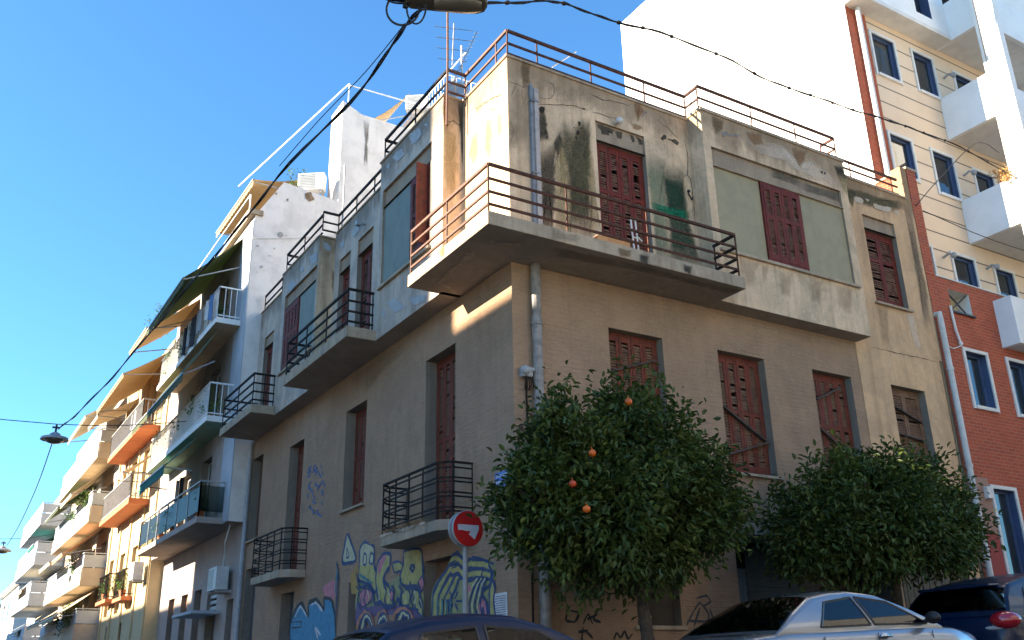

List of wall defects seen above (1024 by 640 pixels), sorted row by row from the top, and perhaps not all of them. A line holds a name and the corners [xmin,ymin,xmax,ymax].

crack [444,82,630,131]
damp [539,112,598,228]
damp [640,168,697,274]